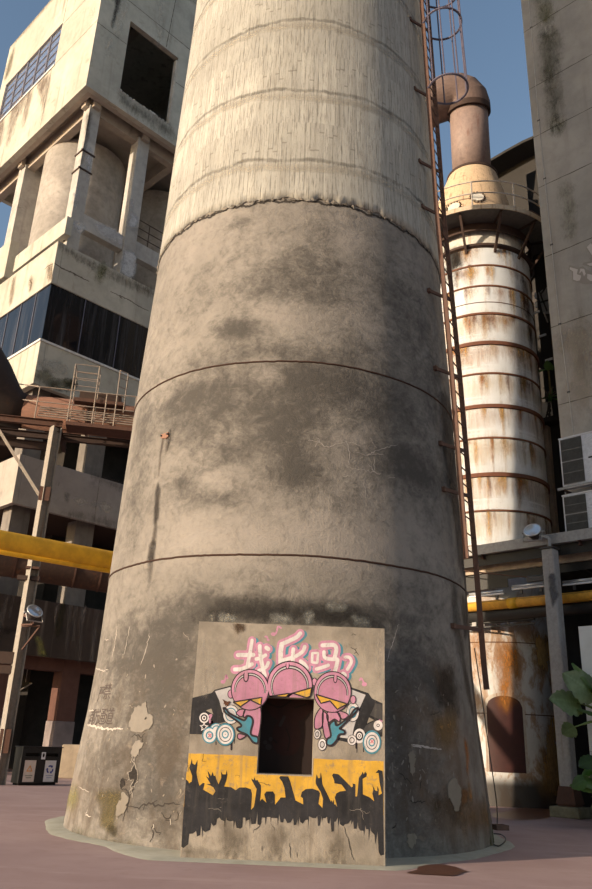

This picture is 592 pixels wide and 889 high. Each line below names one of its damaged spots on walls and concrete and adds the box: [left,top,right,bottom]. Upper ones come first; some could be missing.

damp [148,485,159,562]
rust [498,645,519,707]
rust [533,634,550,673]
peeling [116,701,154,819]
peeling [435,754,462,822]
rust [543,716,560,796]